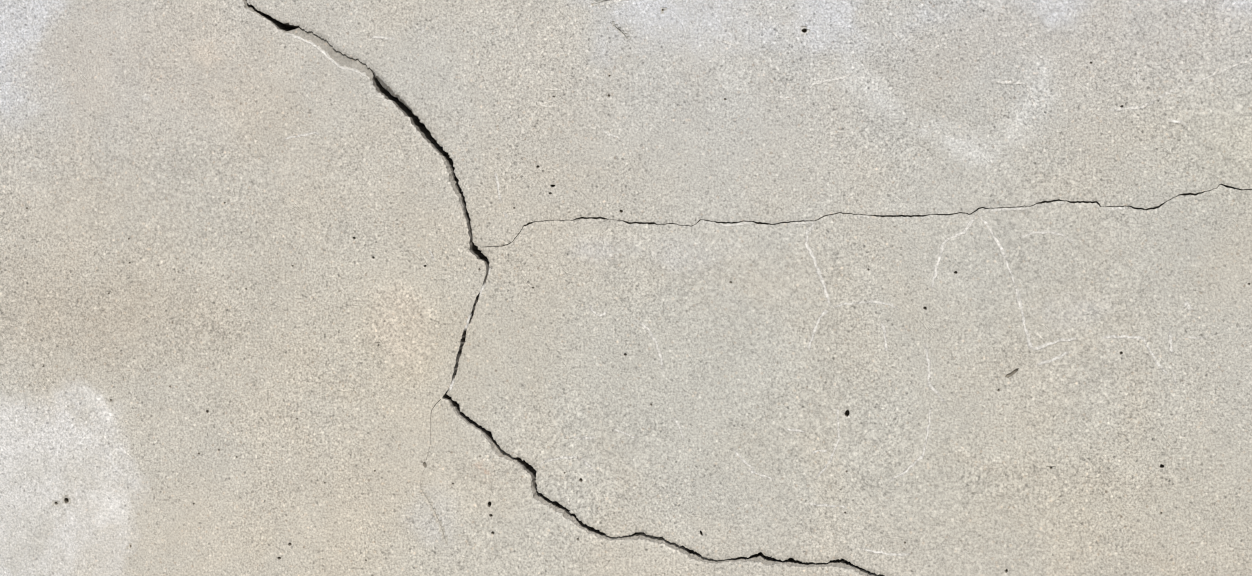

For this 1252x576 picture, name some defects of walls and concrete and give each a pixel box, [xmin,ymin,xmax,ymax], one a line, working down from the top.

crack [243,0,1252,383]
crack [426,389,884,576]
crack [892,346,943,481]